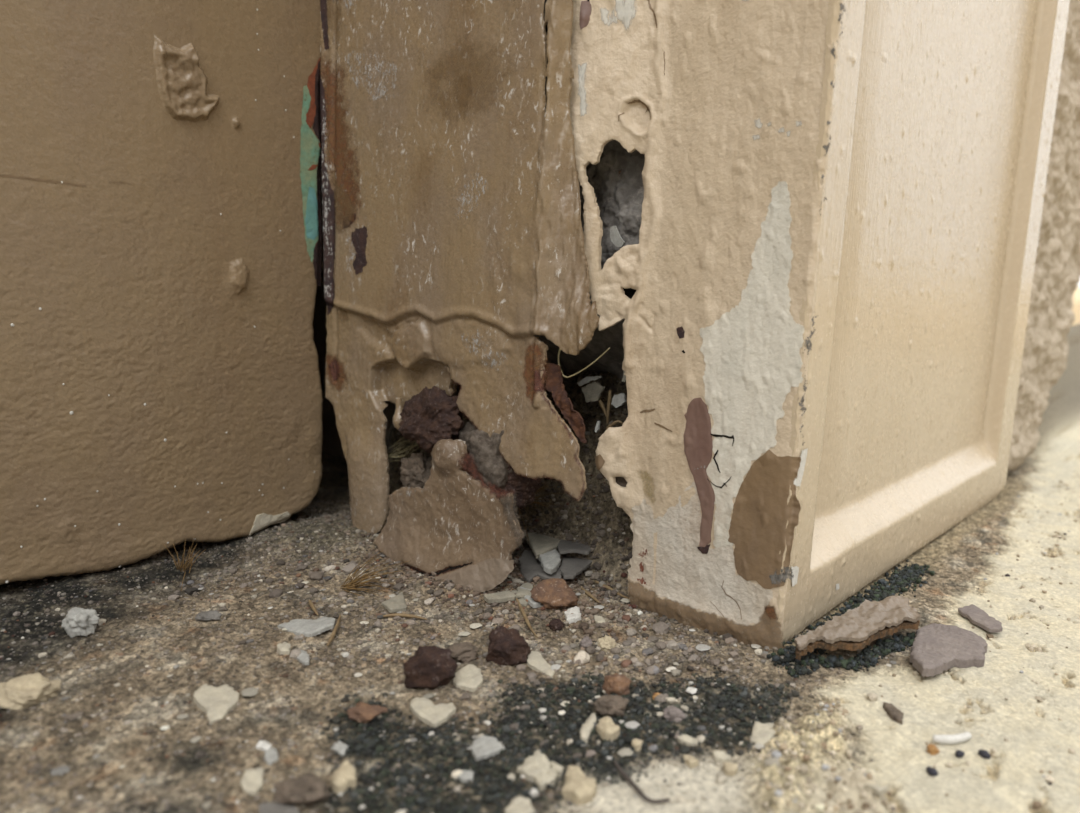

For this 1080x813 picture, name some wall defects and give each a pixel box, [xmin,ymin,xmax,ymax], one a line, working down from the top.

hole [578,140,645,270]
peeling [582,370,626,408]
peeling [628,181,804,626]
peeling [794,448,808,487]
peeling [557,540,591,555]